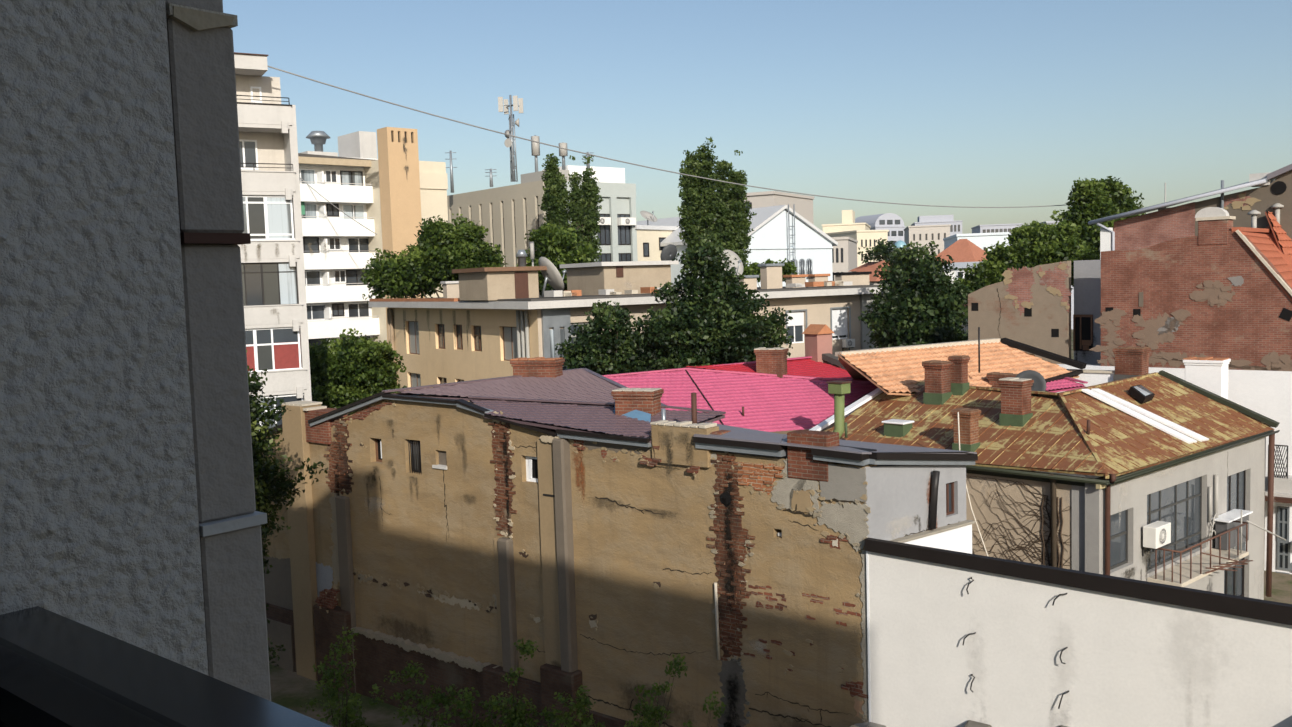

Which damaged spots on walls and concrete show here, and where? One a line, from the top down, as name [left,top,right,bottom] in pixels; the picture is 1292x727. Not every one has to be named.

flaking render [1002,261,1072,316]
peeling [1089,276,1244,366]
peeling [1230,351,1292,371]
flaking render [488,411,528,558]
crack [595,496,667,515]
flaking render [353,568,497,613]
flaking render [686,451,871,727]